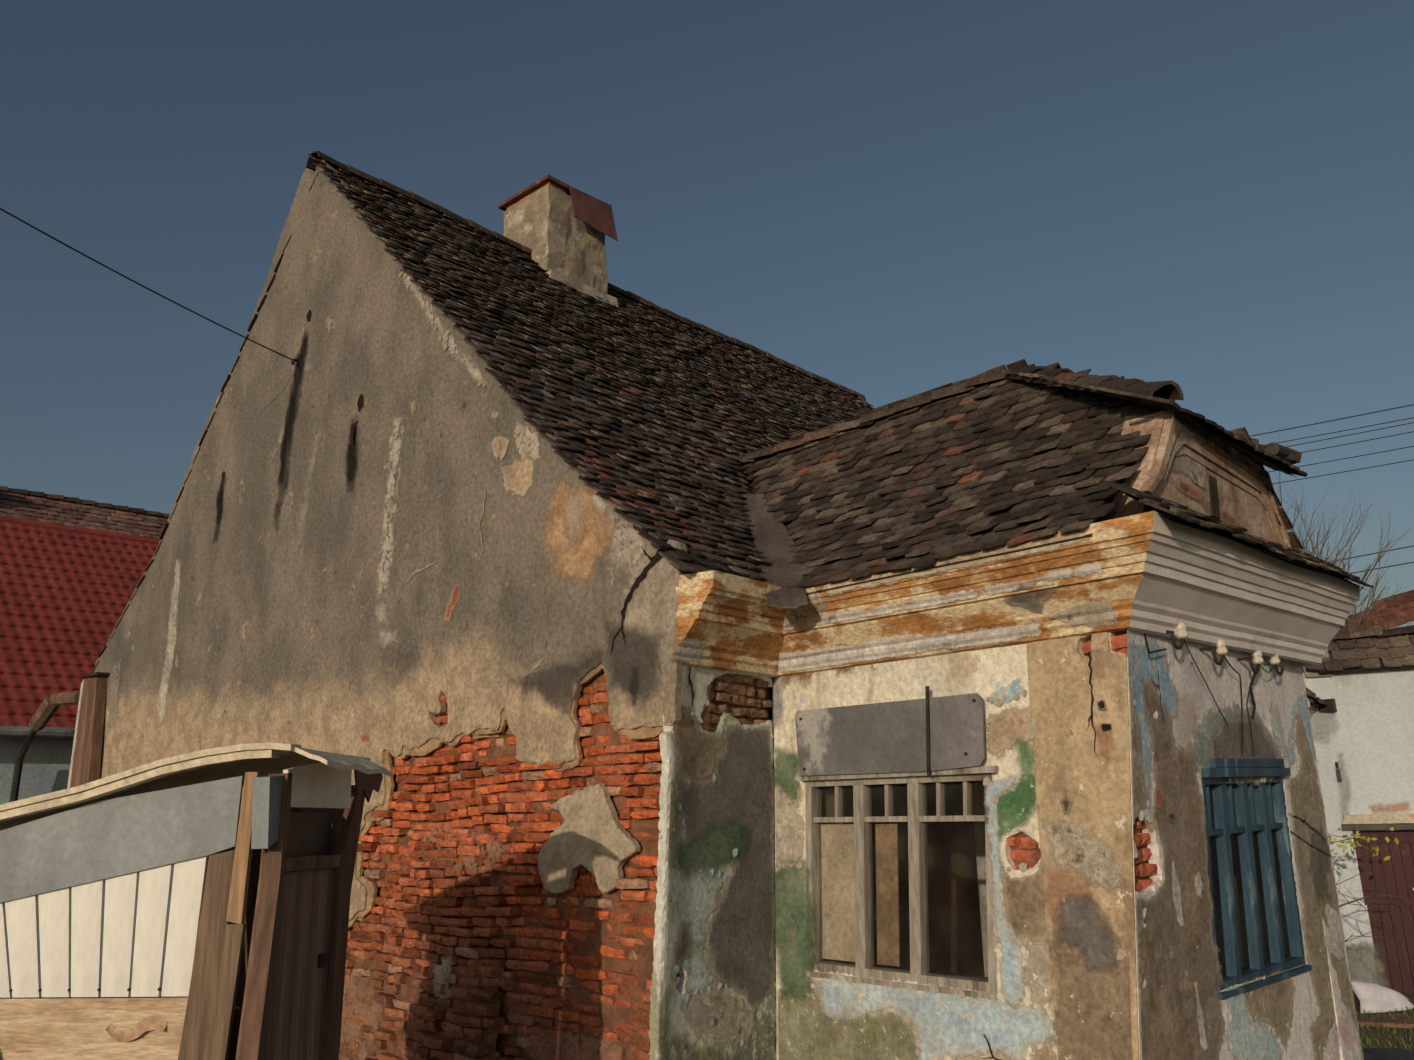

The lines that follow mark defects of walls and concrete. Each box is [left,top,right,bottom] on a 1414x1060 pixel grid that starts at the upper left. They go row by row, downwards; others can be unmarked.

leakage [213,479,224,540]
leakage [274,331,307,519]
spalling [490,422,541,496]
crack [610,529,702,656]
spalling [339,530,1364,1060]